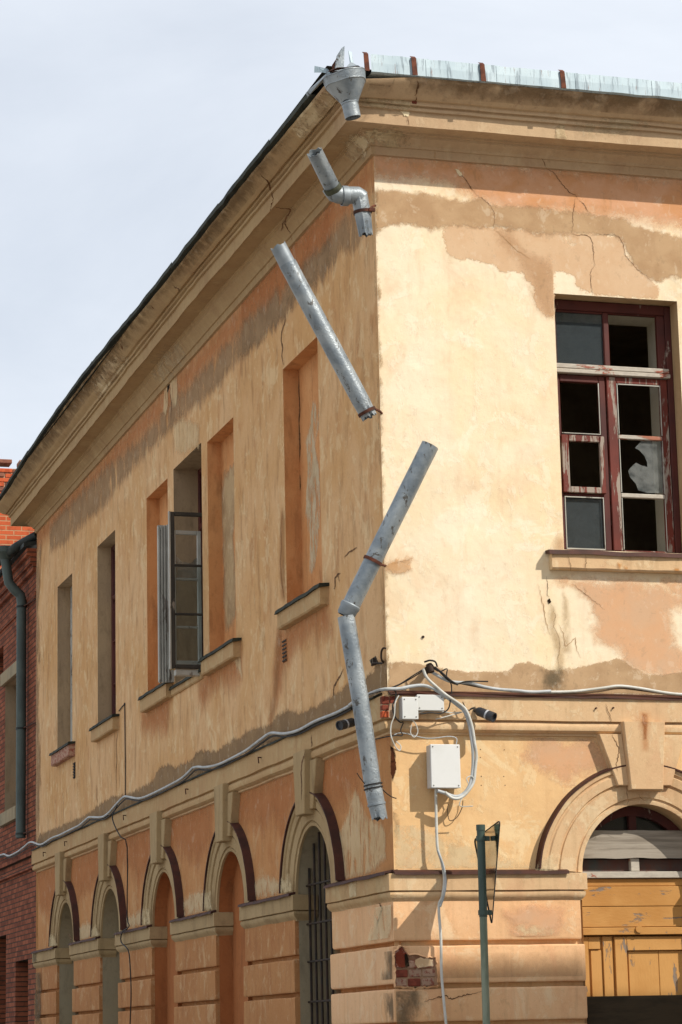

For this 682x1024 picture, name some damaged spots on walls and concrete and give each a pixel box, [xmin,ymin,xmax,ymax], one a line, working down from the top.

peeling [340,134,682,317]
crack [542,159,650,295]
peeling [365,579,682,719]
crack [540,555,603,665]
peeling [37,685,352,846]
flaking render [368,905,440,991]